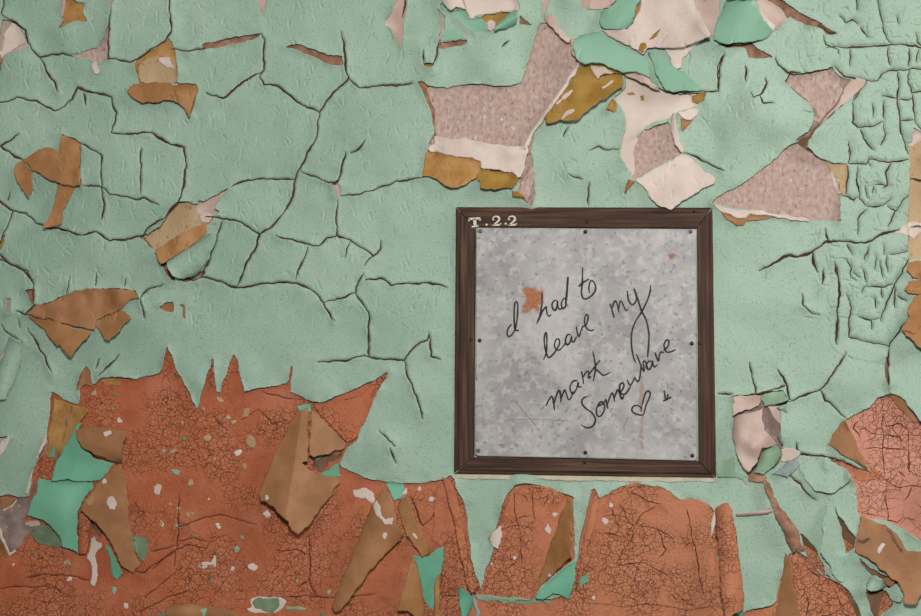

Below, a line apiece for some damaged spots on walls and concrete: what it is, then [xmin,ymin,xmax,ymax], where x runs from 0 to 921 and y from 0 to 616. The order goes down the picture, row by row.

peeling [0,392,140,594]
peeling [26,288,139,357]
crack [0,0,187,373]
crack [107,0,206,63]
crack [213,391,292,431]
crack [124,33,447,419]
peeling [320,390,921,616]
peeling [418,0,835,210]
crack [668,54,725,94]
peeling [712,66,867,225]
crack [745,0,921,526]
peeling [885,128,921,423]